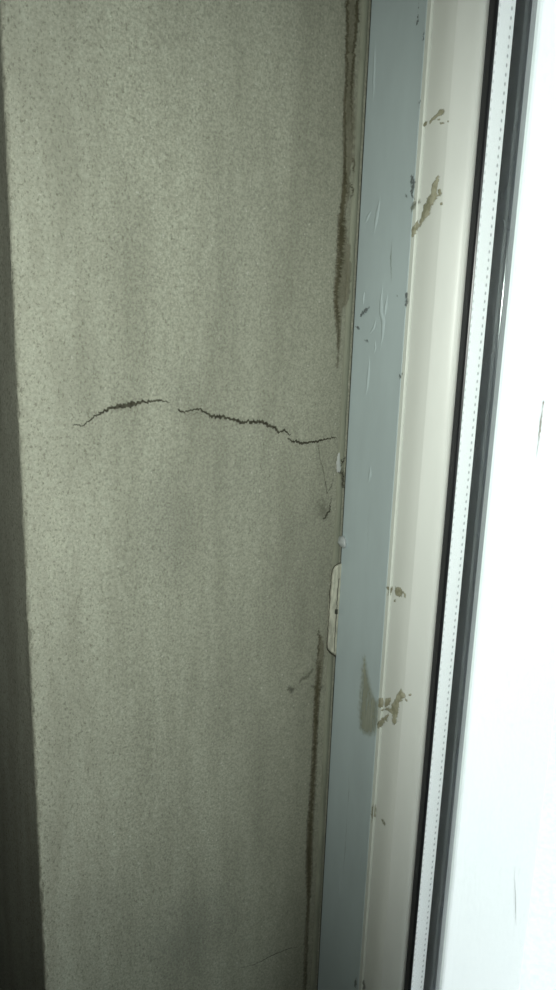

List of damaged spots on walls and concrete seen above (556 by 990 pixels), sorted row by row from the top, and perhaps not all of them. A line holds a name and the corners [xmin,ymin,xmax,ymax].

water stain [333,0,360,368]
crack [73,399,334,445]
water stain [301,633,324,990]